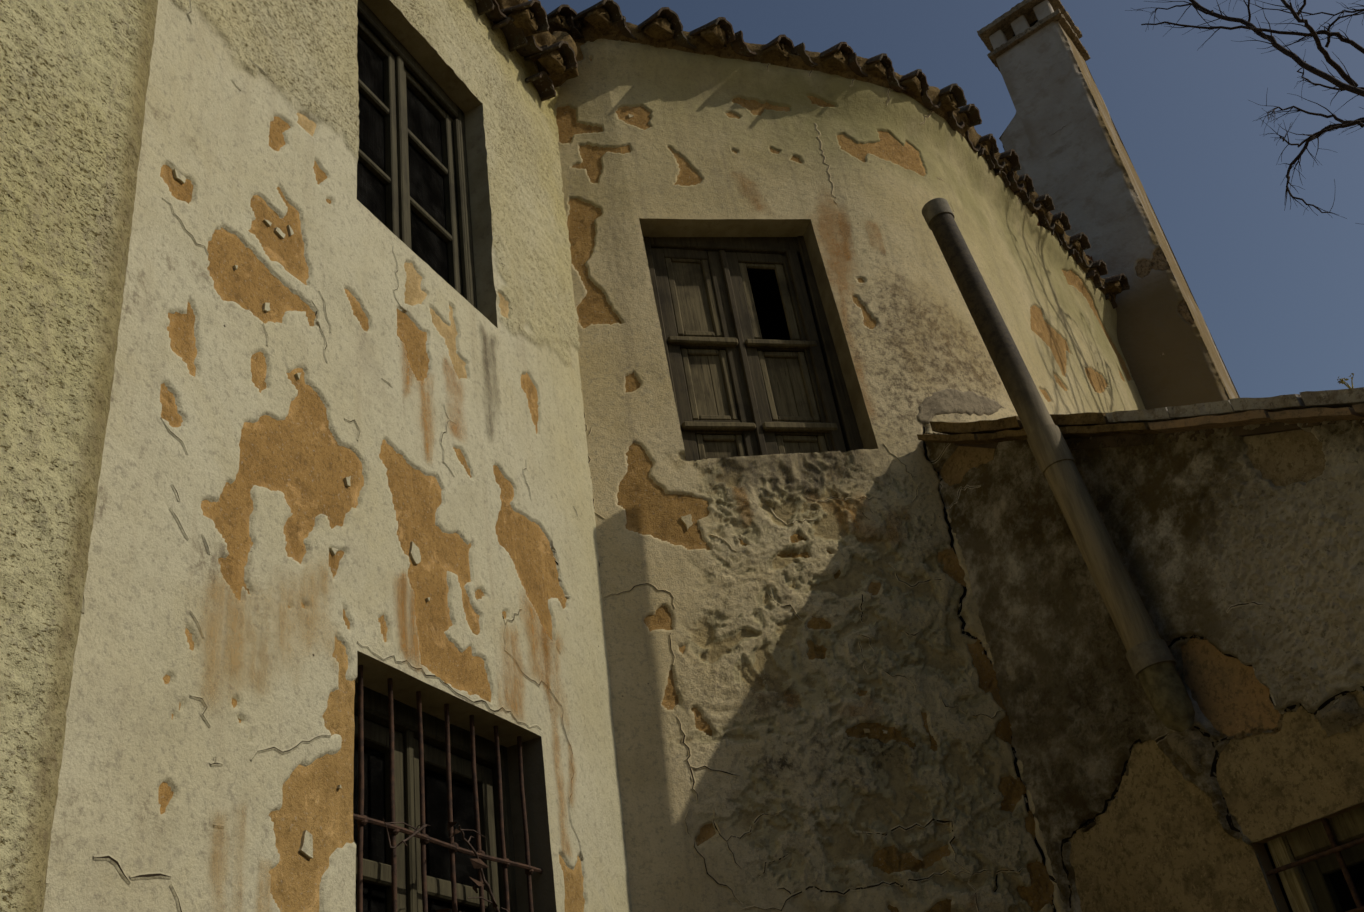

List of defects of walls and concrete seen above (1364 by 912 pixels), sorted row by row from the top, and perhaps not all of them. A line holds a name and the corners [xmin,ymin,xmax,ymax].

flaking render [207,187,316,326]
crack [93,854,183,912]
flaking render [201,368,364,600]
flaking render [268,609,355,912]
flaking render [378,439,492,702]
flaking render [493,465,567,640]
crack [673,710,998,912]
crack [883,427,981,554]
crack [957,586,992,664]
crack [1011,726,1242,912]
spalling [1069,638,1364,912]
crack [1168,635,1364,730]